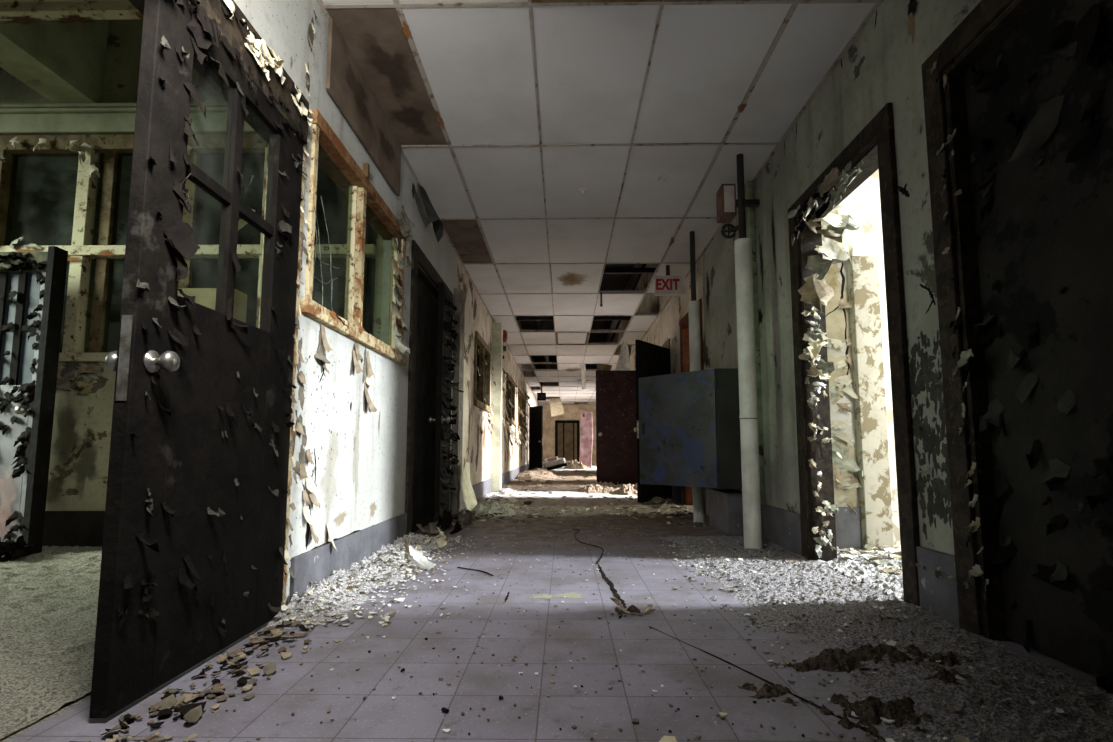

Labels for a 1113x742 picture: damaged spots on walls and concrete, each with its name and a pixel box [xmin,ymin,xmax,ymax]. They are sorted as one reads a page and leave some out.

peeling [65,140,101,178]
peeling [10,237,41,250]
damp [561,274,583,285]
peeling [157,0,377,612]
peeling [56,362,109,395]
peeling [788,161,863,561]
peeling [907,307,989,591]